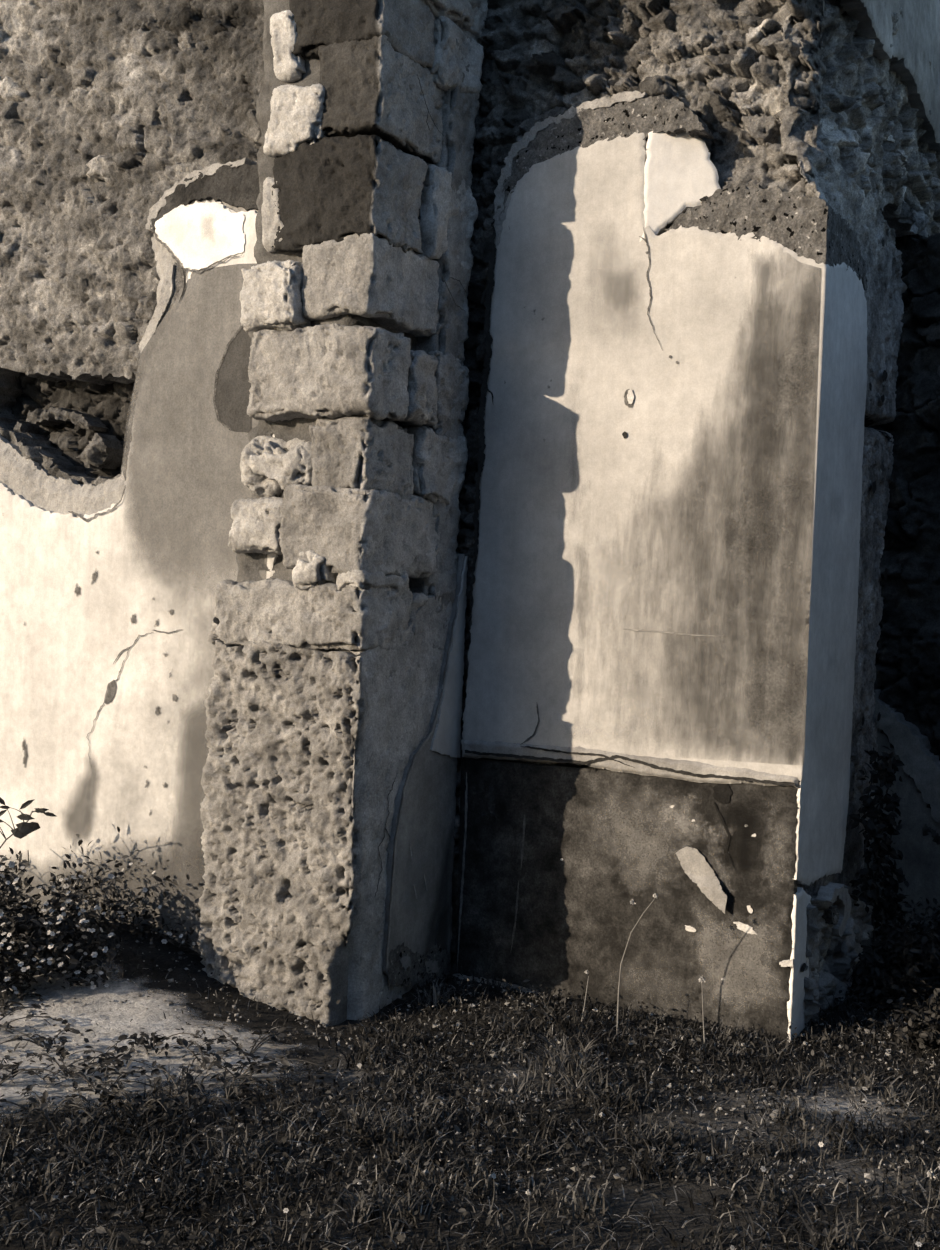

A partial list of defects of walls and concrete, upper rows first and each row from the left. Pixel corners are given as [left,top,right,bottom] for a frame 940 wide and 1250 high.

peeling [136,158,260,373]
crack [639,227,678,364]
flaking render [664,184,868,290]
flaking render [213,326,252,433]
peeling [13,388,135,488]
damp [666,267,821,761]
crack [87,629,183,769]
crack [465,704,795,786]
peeling [816,882,852,937]